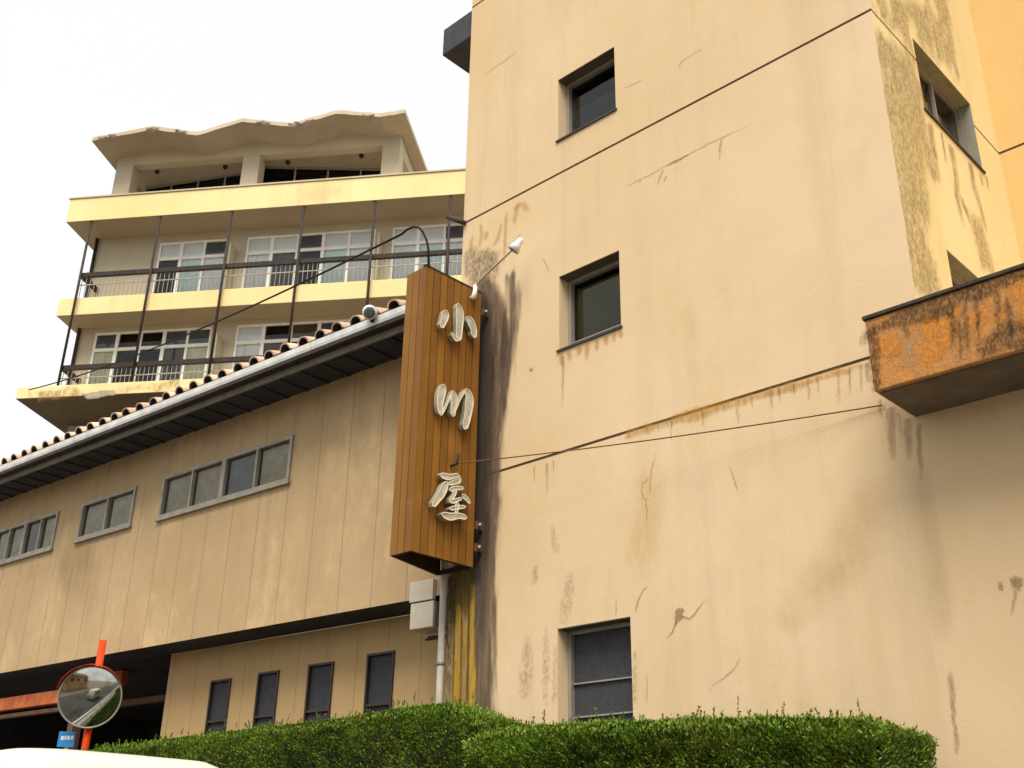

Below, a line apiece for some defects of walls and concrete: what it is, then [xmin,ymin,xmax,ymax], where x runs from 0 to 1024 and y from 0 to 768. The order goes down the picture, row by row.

leakage [878,0,957,71]
leakage [862,33,1024,389]
leakage [445,251,518,713]